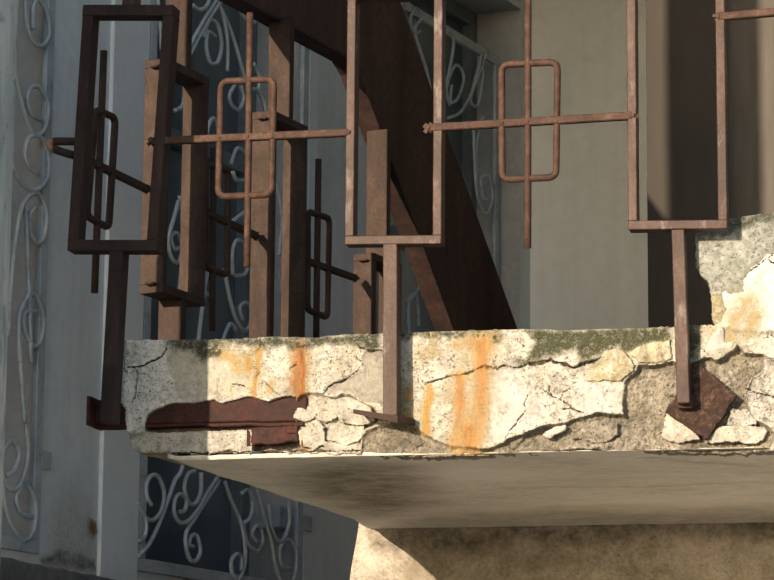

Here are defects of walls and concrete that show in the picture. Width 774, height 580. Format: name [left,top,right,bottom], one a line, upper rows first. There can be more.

spalling [129,212,774,458]
crack [124,344,168,403]
rust [217,346,262,400]
rust [290,344,307,400]
rust [449,335,496,456]
crack [425,348,613,385]
crack [505,385,584,438]